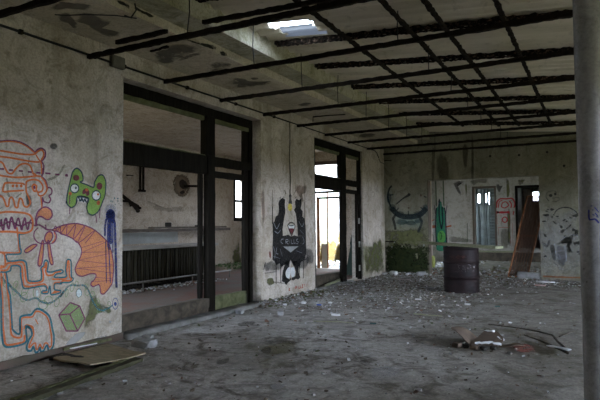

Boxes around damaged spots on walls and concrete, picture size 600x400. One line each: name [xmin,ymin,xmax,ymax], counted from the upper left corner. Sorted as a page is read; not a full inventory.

water stain [53,2,118,36]
water stain [156,39,230,71]